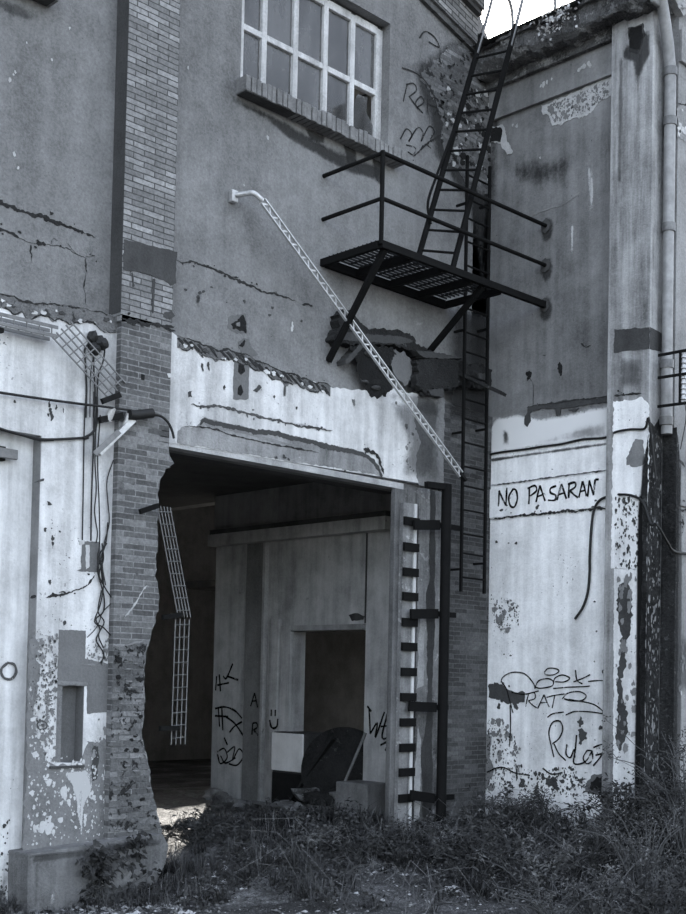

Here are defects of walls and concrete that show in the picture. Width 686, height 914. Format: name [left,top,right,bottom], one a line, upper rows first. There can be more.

spalling [420,43,513,195]
peeling [541,77,611,126]
crack [0,199,97,302]
spalling [0,293,118,333]
crack [177,260,312,307]
spalling [177,300,331,396]
spalling [325,309,492,486]
peeling [485,396,650,812]
peeling [22,621,160,851]